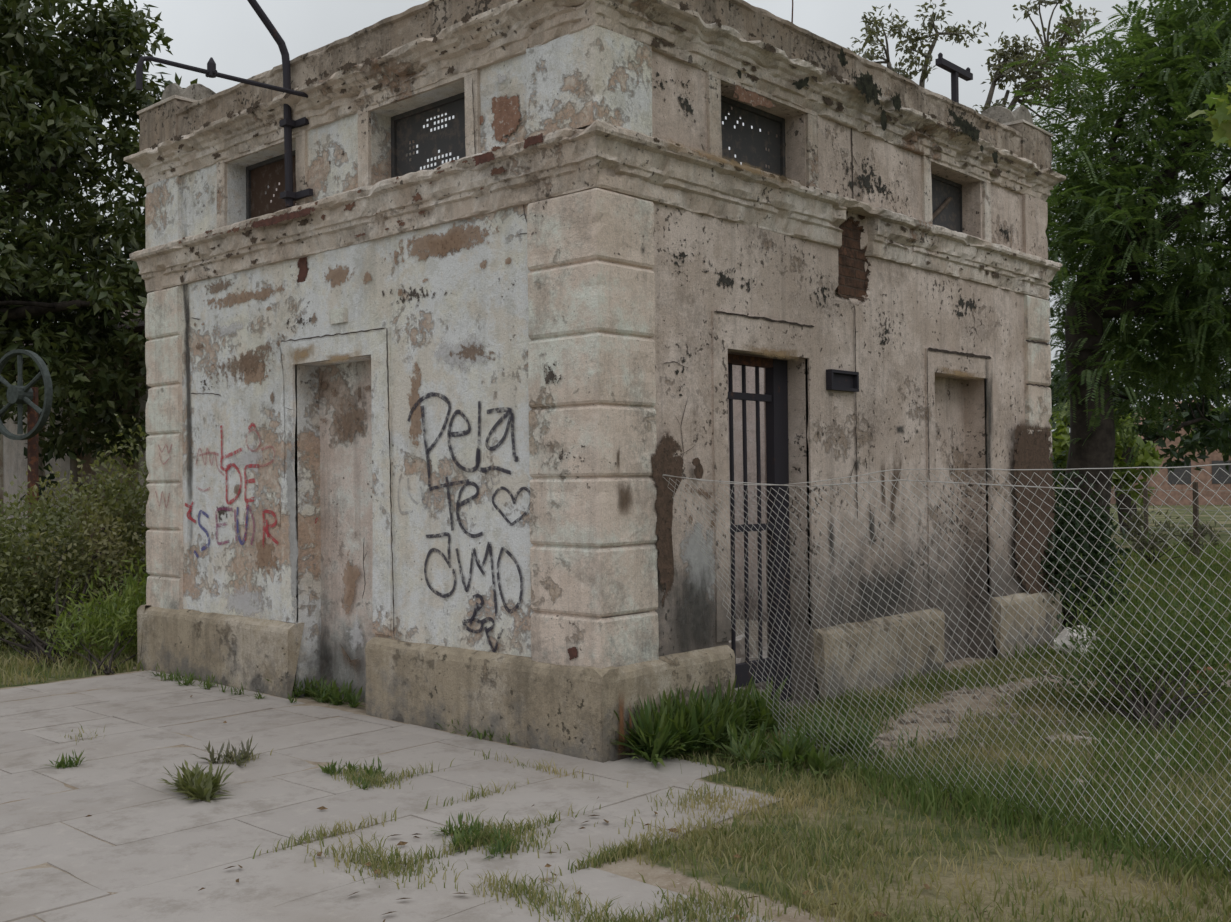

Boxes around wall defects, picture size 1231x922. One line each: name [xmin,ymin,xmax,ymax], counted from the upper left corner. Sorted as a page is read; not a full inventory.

spalling [412,94,543,215]
flaking render [805,156,899,209]
peeling [179,202,326,310]
peeling [325,265,372,287]
peeling [382,278,447,306]
peeling [385,222,499,265]
spalling [813,211,871,324]
flaking render [940,294,991,320]
flaking render [980,225,1016,281]
peeling [200,313,317,404]